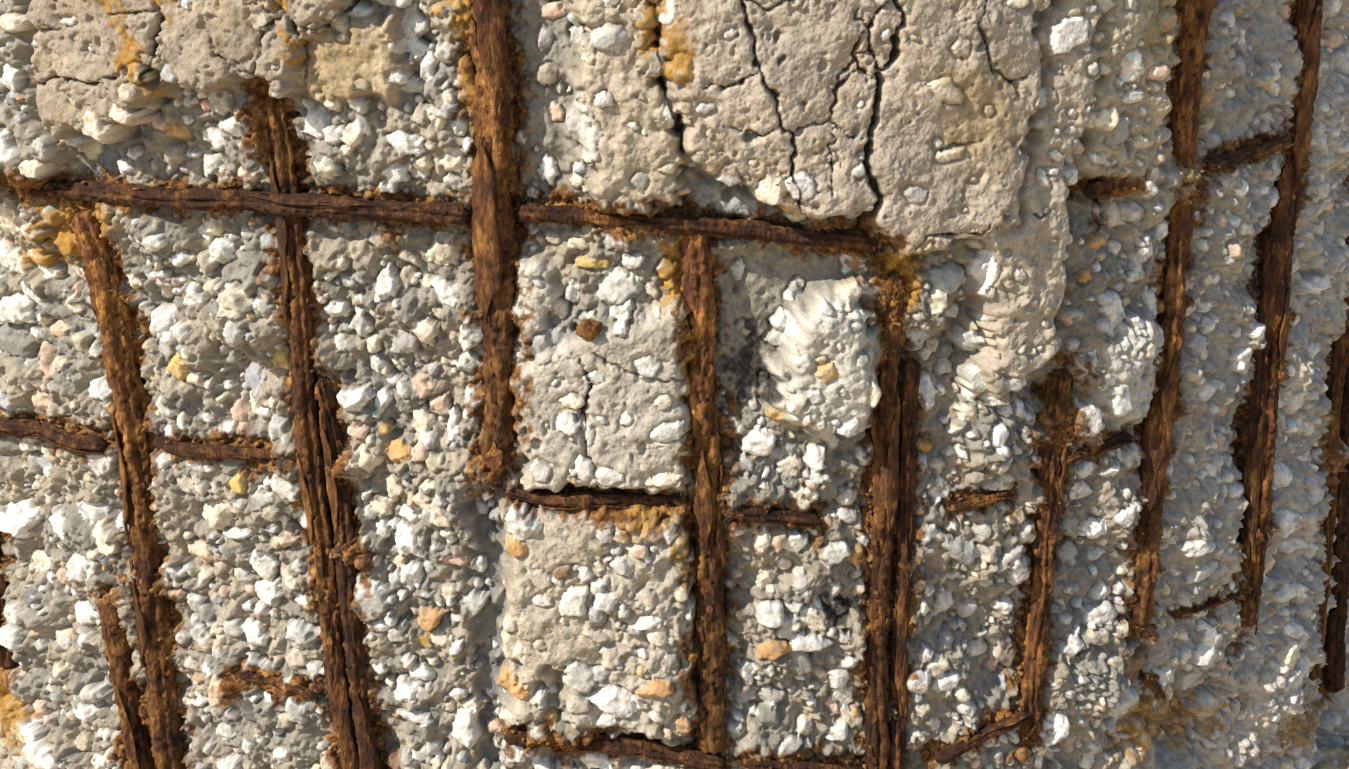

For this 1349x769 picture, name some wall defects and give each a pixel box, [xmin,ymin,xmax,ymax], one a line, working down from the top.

crack [38,10,166,85]
spalling [0,0,303,194]
crack [217,0,360,80]
crack [648,1,684,151]
crack [710,0,904,222]
crack [978,5,1025,83]
corrosion [1142,0,1321,330]
corrosion [0,0,933,769]
spalling [933,0,1349,769]
corrosion [1230,208,1297,484]
corrosion [886,348,1257,769]
corrosion [1277,334,1349,755]